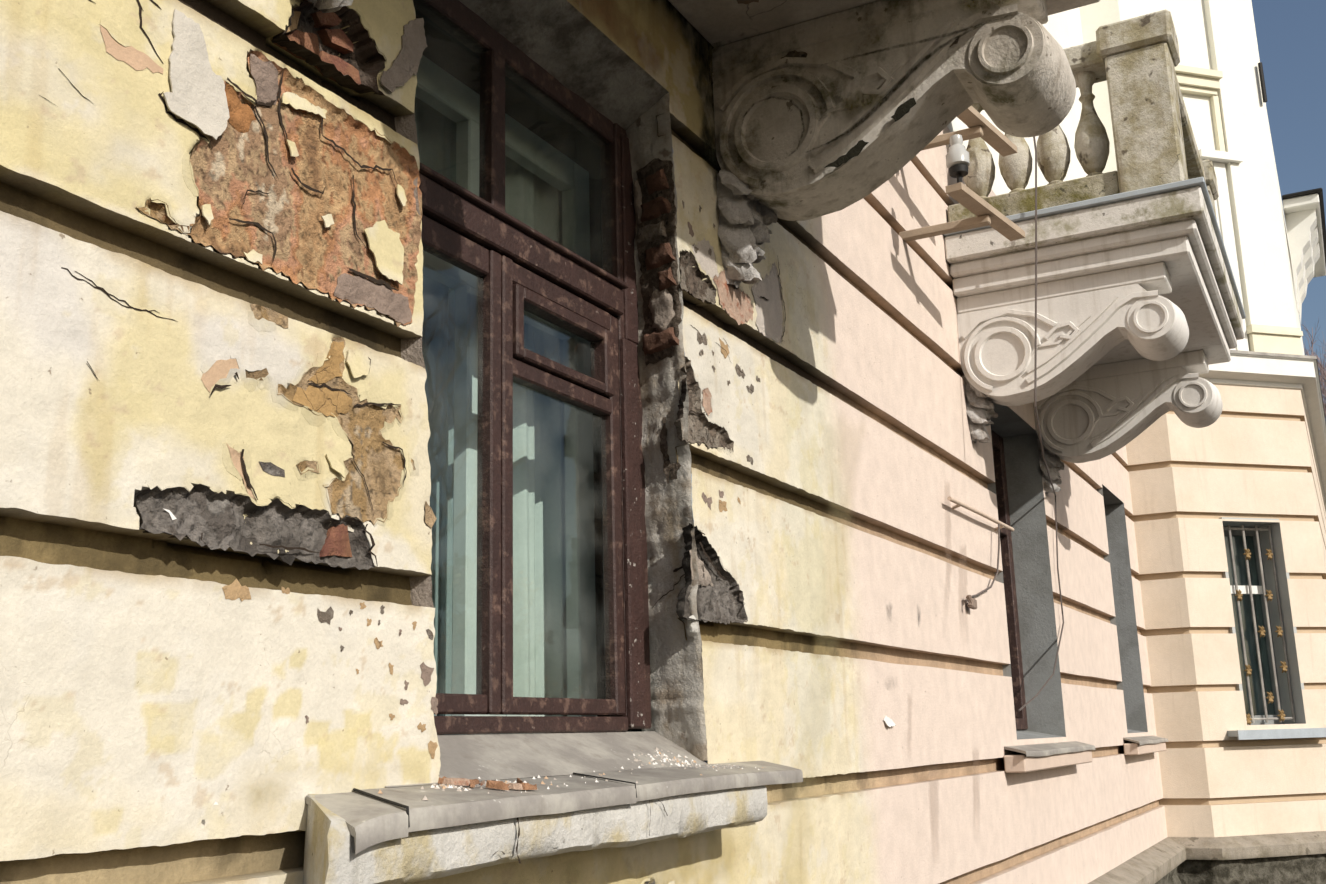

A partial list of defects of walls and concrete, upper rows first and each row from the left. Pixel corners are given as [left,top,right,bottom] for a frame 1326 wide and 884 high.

crack [137,0,209,141]
flaking render [136,9,428,327]
crack [61,267,176,321]
flaking render [636,158,786,465]
flaking render [133,337,419,570]
flaking render [676,523,748,625]
flaking render [638,875,660,884]